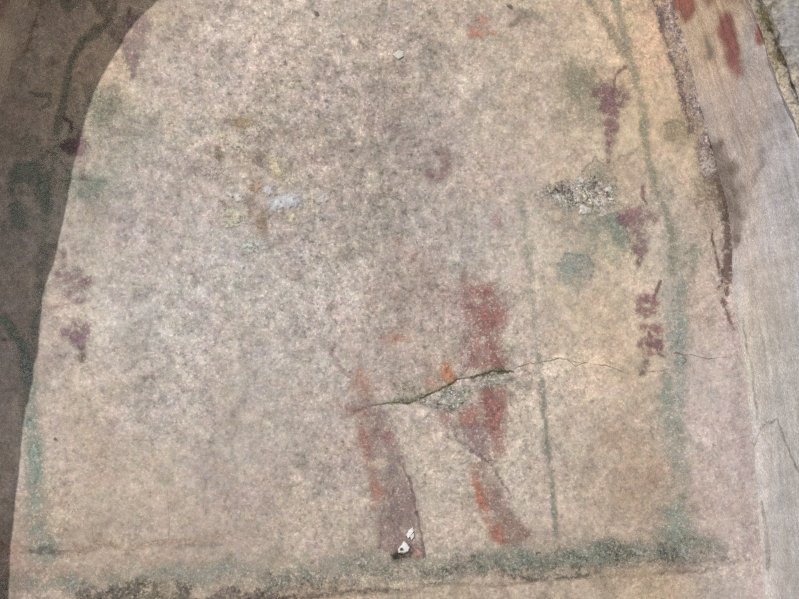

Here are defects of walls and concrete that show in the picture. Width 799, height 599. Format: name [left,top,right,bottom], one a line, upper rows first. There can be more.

spalling [537,175,617,216]
crack [381,358,619,405]